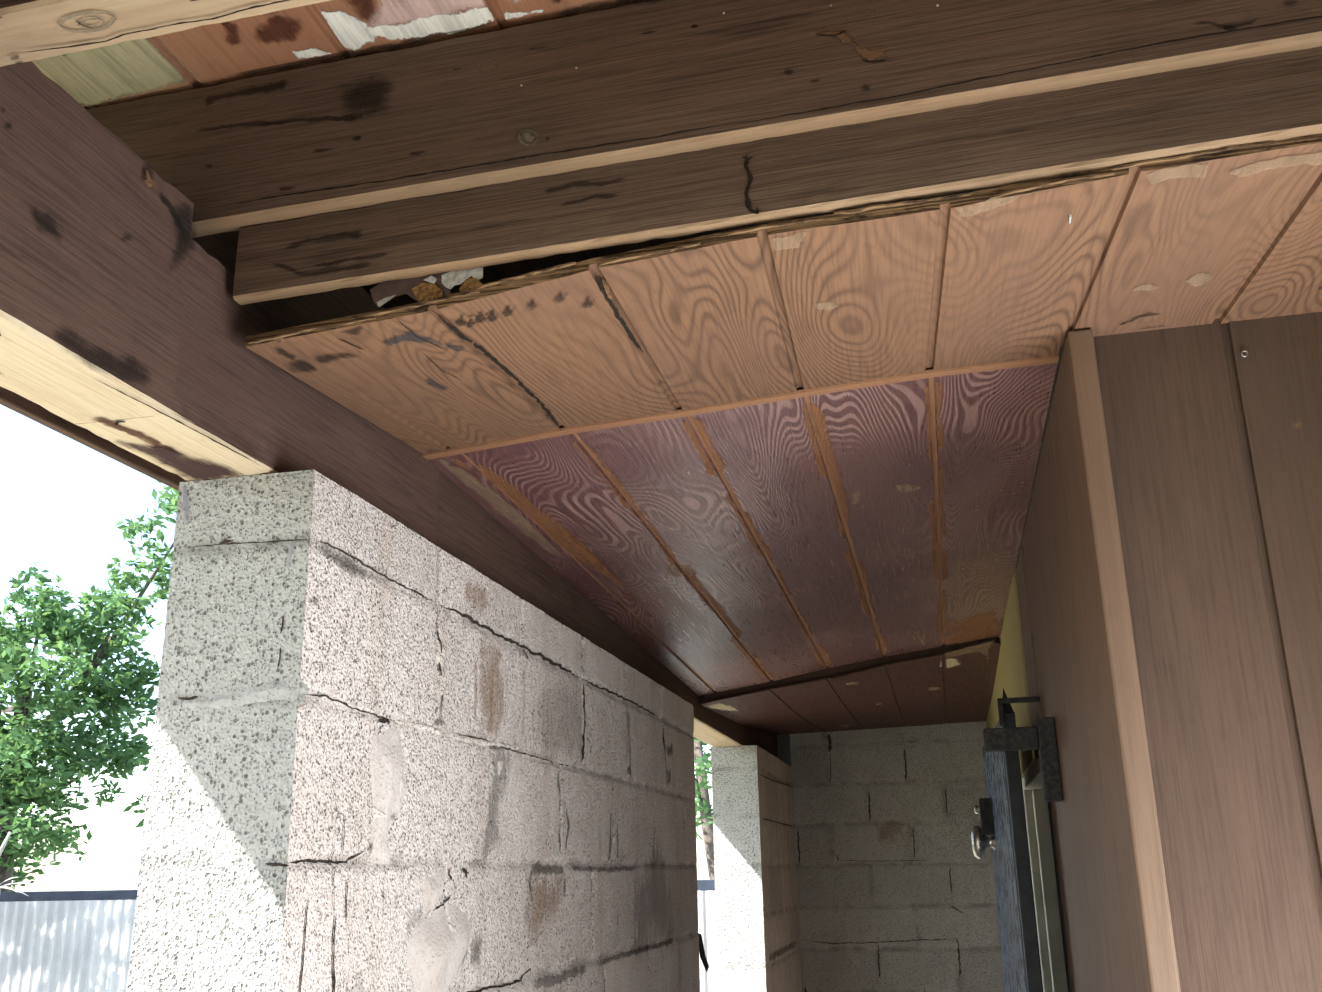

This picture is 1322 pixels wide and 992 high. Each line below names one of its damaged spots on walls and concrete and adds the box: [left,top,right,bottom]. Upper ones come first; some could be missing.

water stain [207,0,658,104]
water stain [203,81,388,131]
crack [212,16,1322,214]
crack [189,539,668,788]
crack [265,851,364,867]
crack [467,968,531,992]